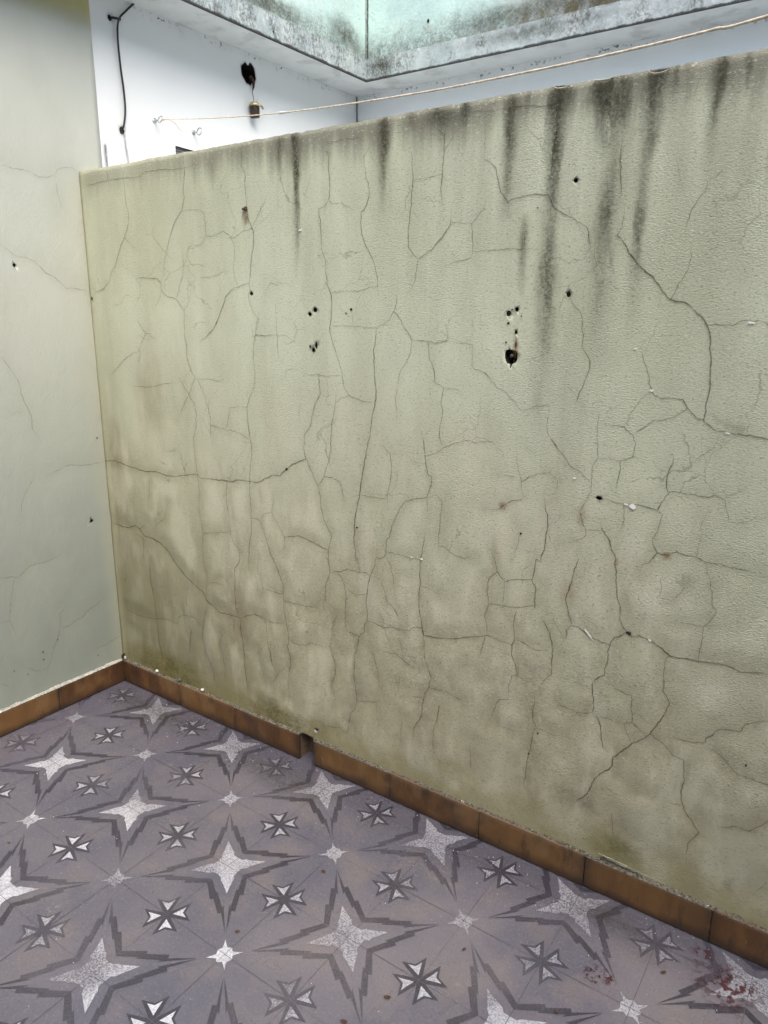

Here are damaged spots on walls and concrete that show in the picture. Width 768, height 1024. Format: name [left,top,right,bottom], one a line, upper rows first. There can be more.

leakage [291,133,299,205]
leakage [380,117,388,168]
leakage [507,94,516,148]
crack [489,161,590,244]
leakage [549,85,571,198]
leakage [593,75,628,120]
leakage [648,68,665,141]
leakage [714,56,728,110]
crack [552,222,768,486]
crack [67,306,757,798]